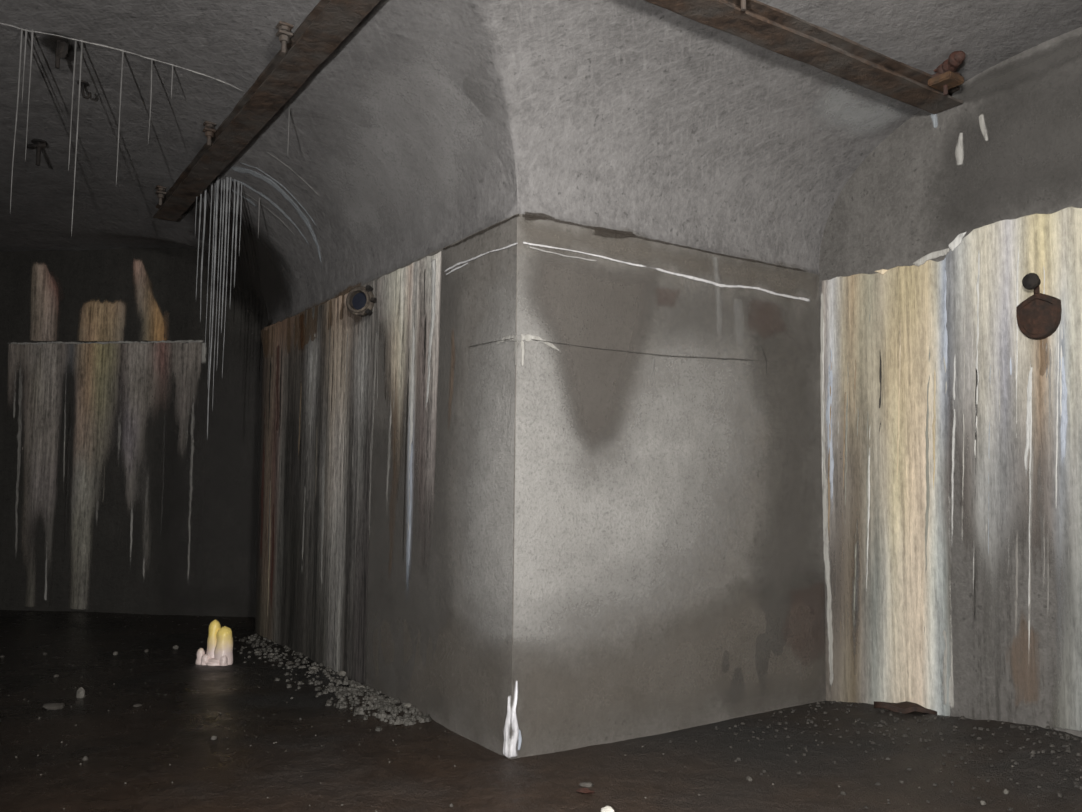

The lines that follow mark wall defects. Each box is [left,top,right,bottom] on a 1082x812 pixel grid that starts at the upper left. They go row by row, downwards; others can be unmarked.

damp [191,207,288,317]
damp [220,163,321,260]
damp [324,10,493,243]
crack [443,212,809,302]
damp [7,251,502,728]
damp [464,38,1082,757]